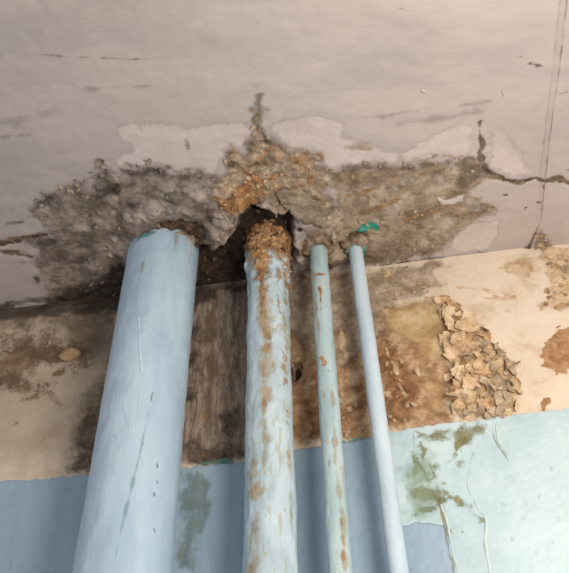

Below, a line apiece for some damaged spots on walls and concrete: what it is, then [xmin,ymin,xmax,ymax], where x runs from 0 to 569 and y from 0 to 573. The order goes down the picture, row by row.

crack [477,120,569,195]
leakage [0,158,248,471]
leakage [179,474,208,566]
leakage [289,257,320,444]
leakage [299,154,497,440]
mould [407,443,464,515]
mould [454,425,484,463]
peeling [389,294,569,573]